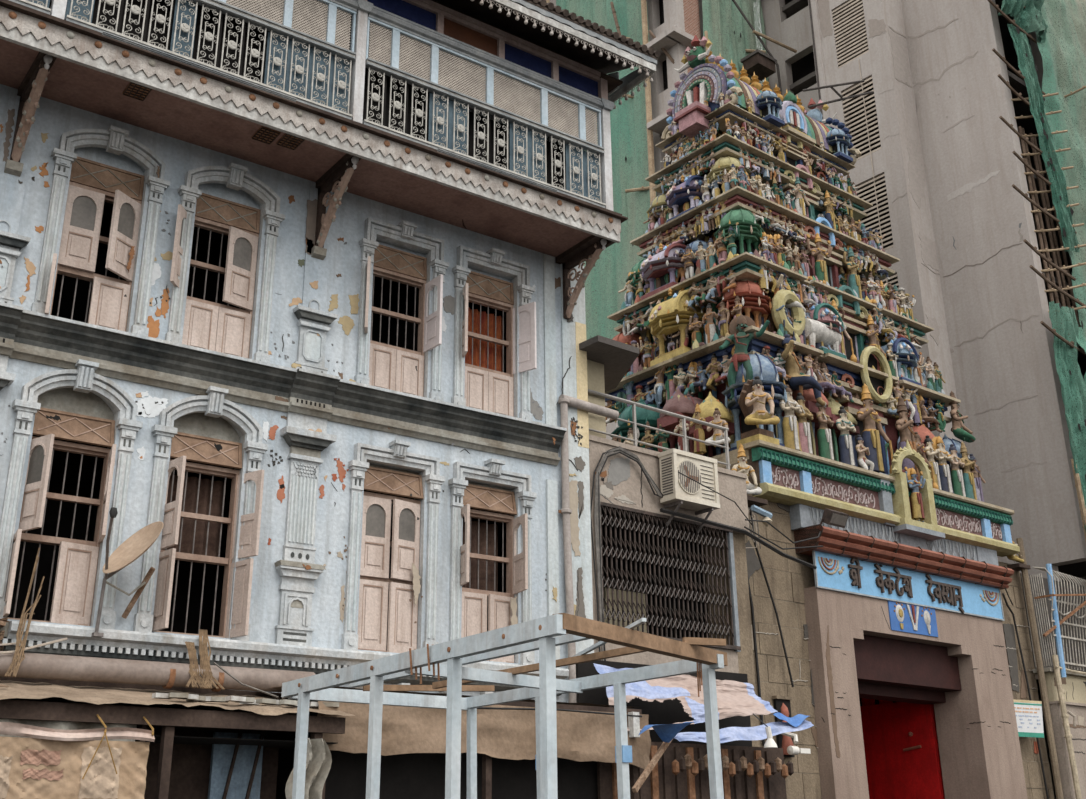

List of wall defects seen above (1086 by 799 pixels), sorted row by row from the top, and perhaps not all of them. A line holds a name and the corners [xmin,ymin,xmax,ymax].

peeling [19,257,36,304]
peeling [147,251,173,338]
peeling [328,294,359,335]
peeling [135,391,168,418]
peeling [263,421,285,503]
peeling [319,458,349,499]